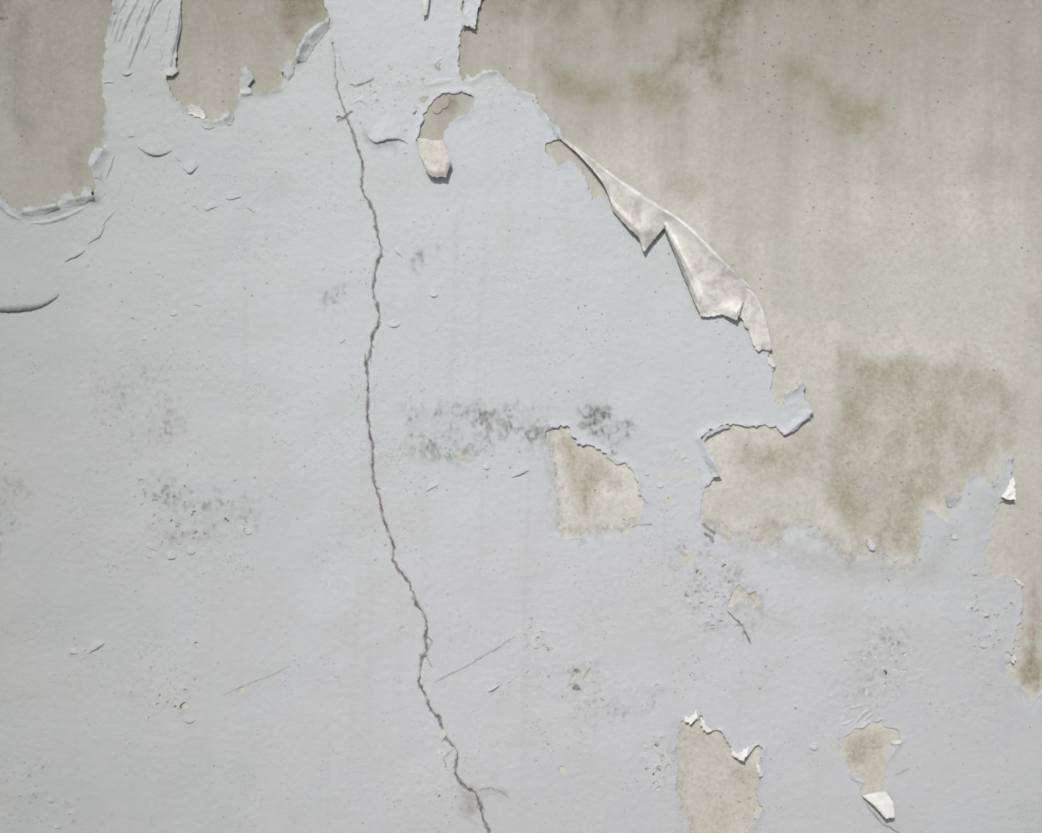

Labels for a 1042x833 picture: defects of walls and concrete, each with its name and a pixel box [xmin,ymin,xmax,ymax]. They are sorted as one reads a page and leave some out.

peeling [0,0,122,216]
peeling [164,0,334,123]
peeling [399,0,1042,705]
crack [342,107,490,831]
spalling [568,662,625,732]
peeling [642,710,763,833]
peeling [840,720,902,819]